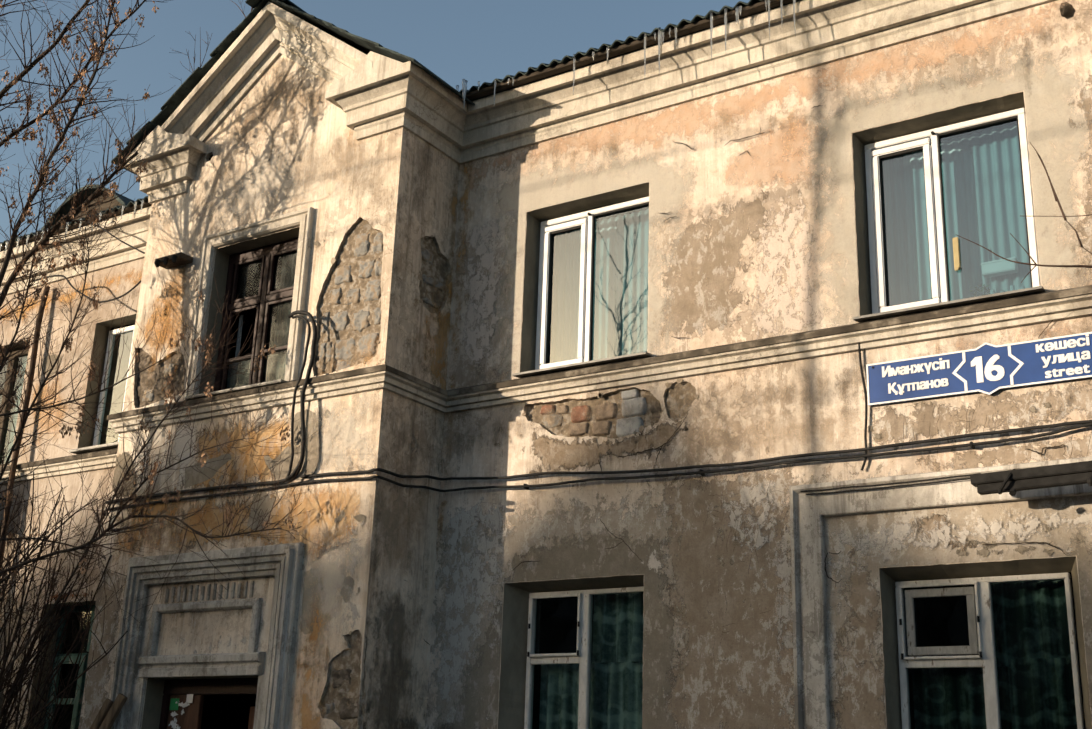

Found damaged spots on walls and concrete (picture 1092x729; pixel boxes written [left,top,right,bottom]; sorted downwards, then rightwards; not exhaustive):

spalling [309,219,384,376]
spalling [418,235,449,314]
spalling [133,349,186,408]
spalling [316,630,367,729]
peeling [427,378,824,729]
peeling [824,495,1092,729]